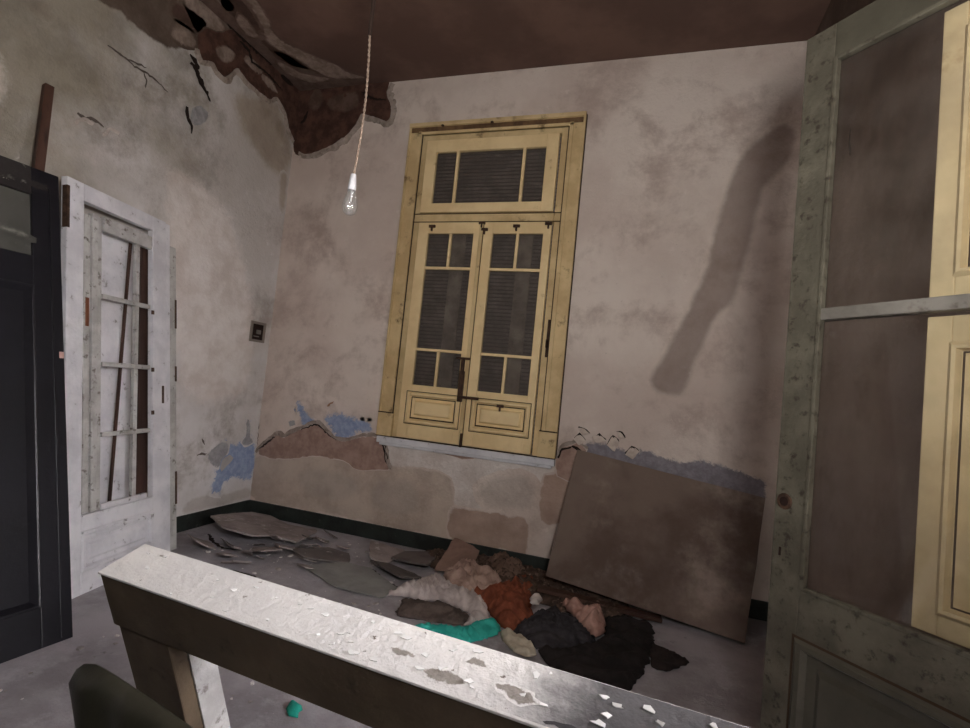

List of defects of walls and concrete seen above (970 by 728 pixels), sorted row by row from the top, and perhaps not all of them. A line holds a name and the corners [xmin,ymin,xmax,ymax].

peeling [0,42,17,114]
crack [108,45,168,92]
crack [185,54,211,134]
spalling [93,0,397,159]
damp [646,119,801,401]
peeling [180,397,771,554]